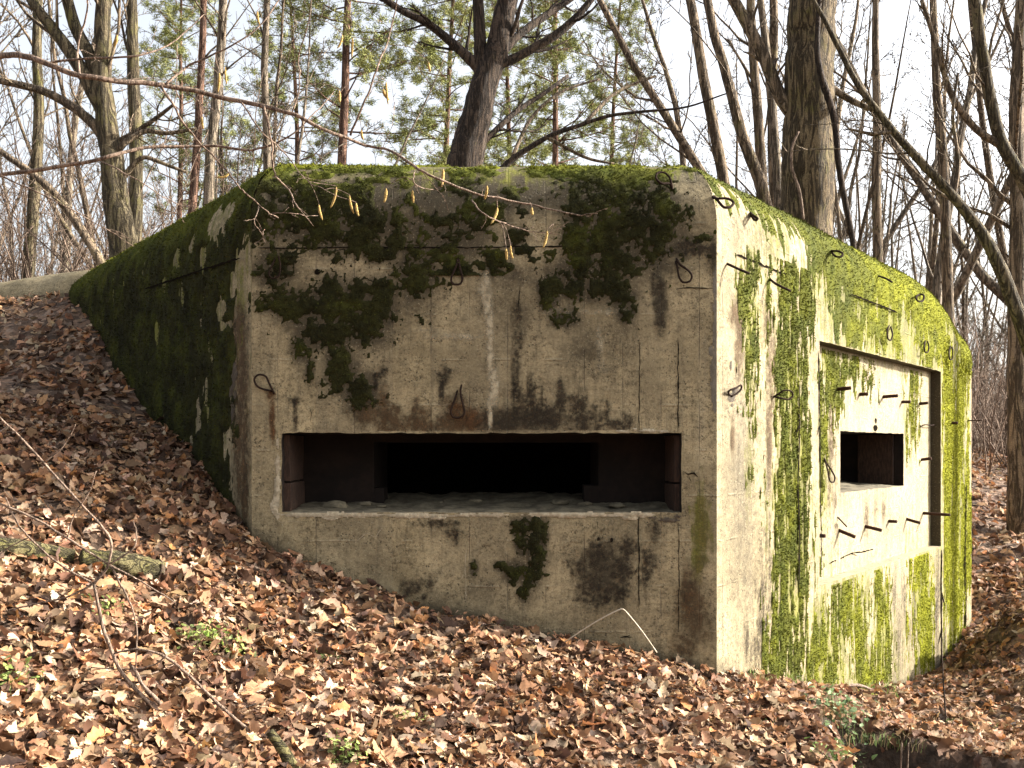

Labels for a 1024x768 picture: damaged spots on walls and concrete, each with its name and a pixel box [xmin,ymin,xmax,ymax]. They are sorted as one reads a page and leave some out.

leakage [477,271,632,430]
corrosion [352,388,483,431]
leakage [567,521,660,609]